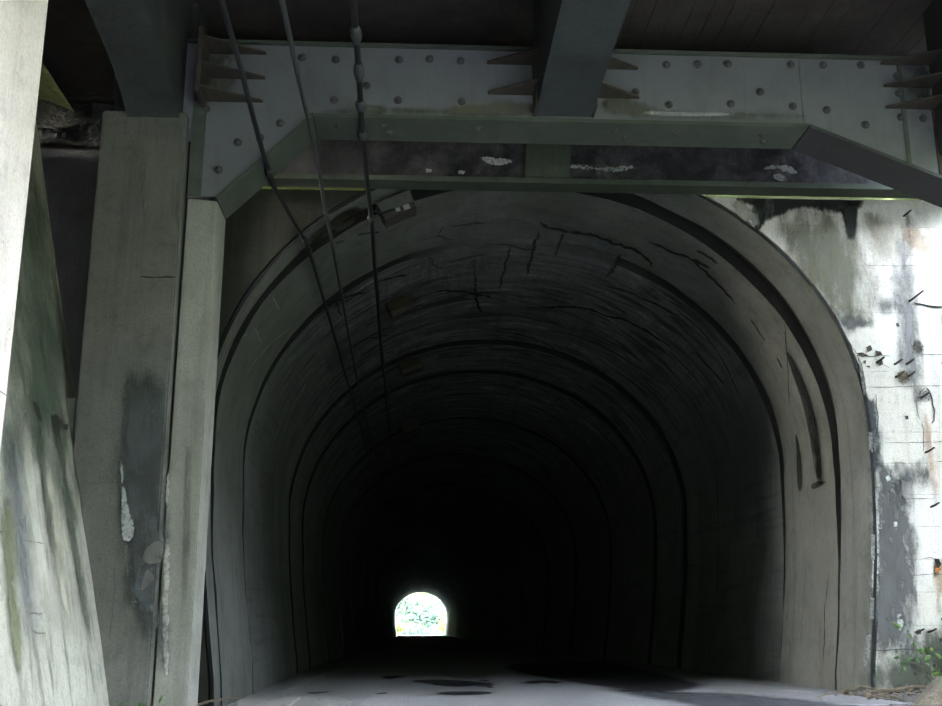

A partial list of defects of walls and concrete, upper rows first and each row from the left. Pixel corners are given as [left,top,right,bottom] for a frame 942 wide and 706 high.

leakage [731,198,864,239]
crack [420,222,739,396]
leakage [841,316,870,330]
spalling [844,335,883,395]
leakage [880,215,931,403]
leakage [5,417,91,634]
leakage [120,374,170,676]
leakage [866,397,942,693]
spalling [863,635,871,672]